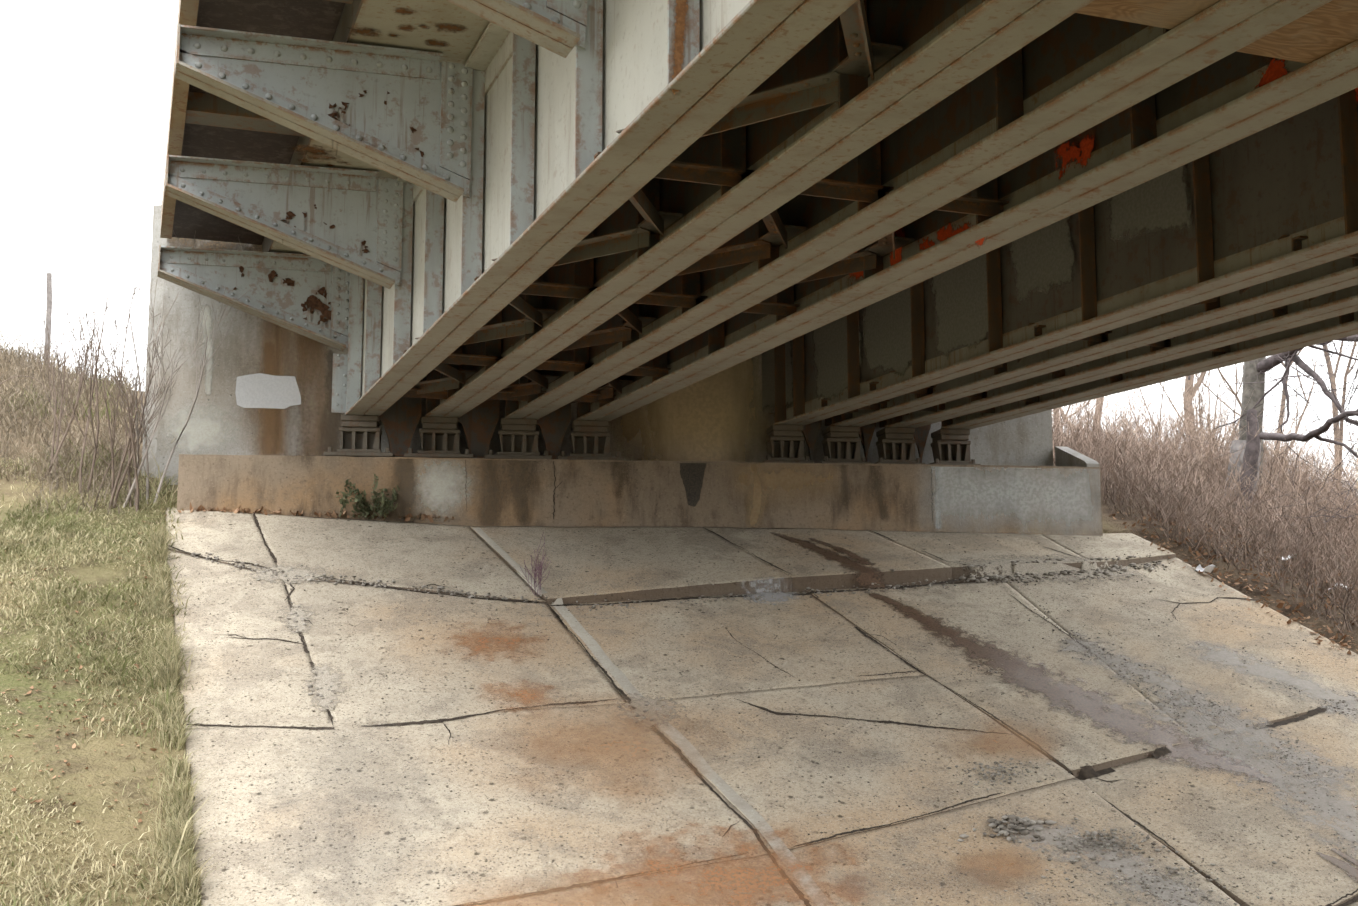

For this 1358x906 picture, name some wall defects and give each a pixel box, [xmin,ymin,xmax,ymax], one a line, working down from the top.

corrosion [351,8,465,46]
corrosion [670,0,689,95]
leakage [652,360,763,527]
leakage [936,467,1089,535]
spalling [245,563,329,635]
crack [1159,597,1262,621]
spalling [304,663,346,711]
crack [170,461,1091,906]
leakage [771,532,1275,783]
crack [740,627,1175,850]